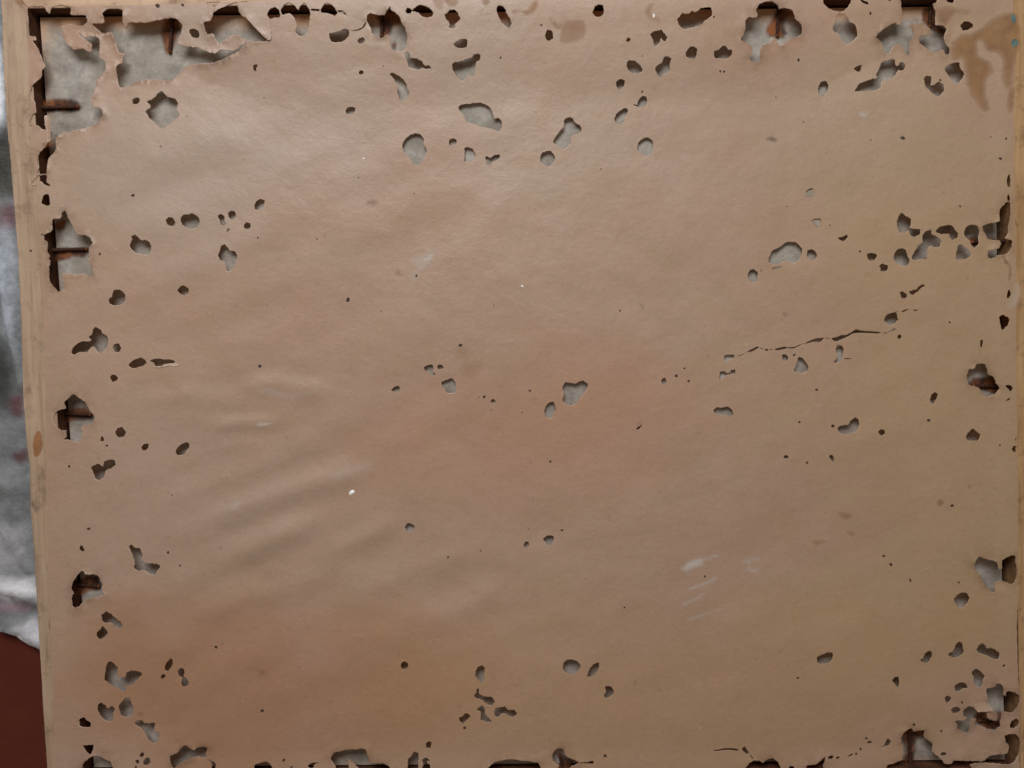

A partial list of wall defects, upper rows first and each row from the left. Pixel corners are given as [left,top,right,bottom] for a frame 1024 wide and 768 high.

rust [767,9,791,37]
damp [958,18,1015,96]
rust [43,99,81,112]
rust [54,251,86,260]
rust [969,377,997,393]